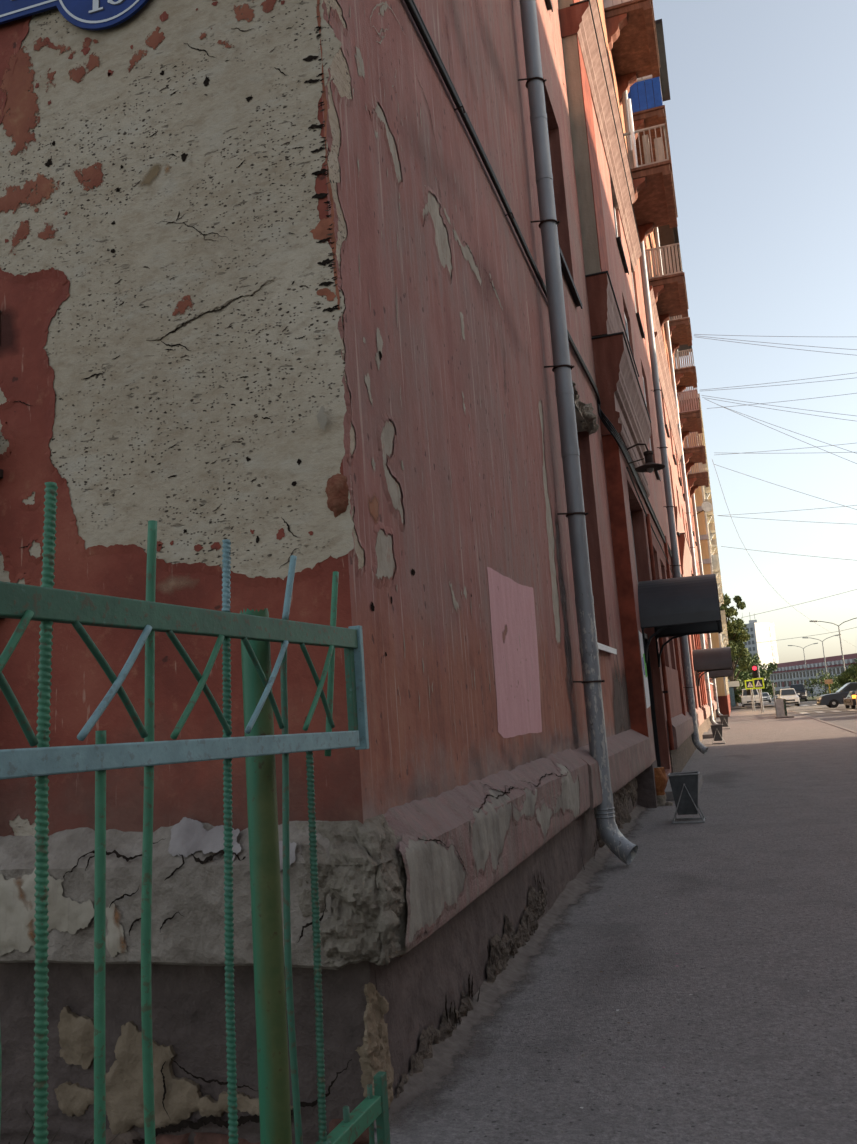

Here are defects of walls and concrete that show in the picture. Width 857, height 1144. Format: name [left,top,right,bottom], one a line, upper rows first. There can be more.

peeling [420,185,503,310]
peeling [0,0,415,603]
crack [146,276,274,351]
peeling [5,809,55,837]
spalling [0,867,127,957]
crack [63,839,245,936]
spalling [168,817,241,860]
spalling [279,785,512,968]
crack [475,773,567,813]
spalling [58,1006,94,1069]
spalling [54,1021,261,1144]
spalling [355,871,547,1109]